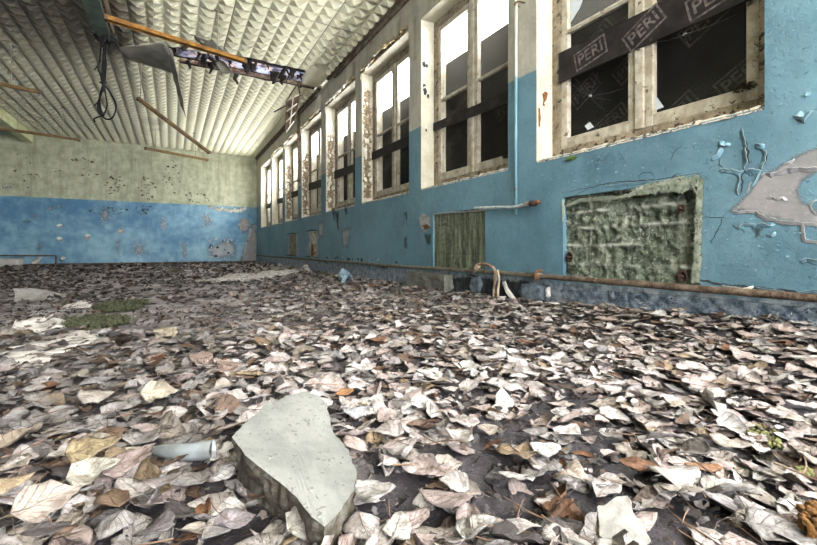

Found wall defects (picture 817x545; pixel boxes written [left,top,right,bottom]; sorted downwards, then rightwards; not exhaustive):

peeling [271,24,408,208]
flaking render [206,223,257,262]
flaking render [419,209,485,270]
flaking render [561,157,817,294]
flaking render [707,128,817,265]